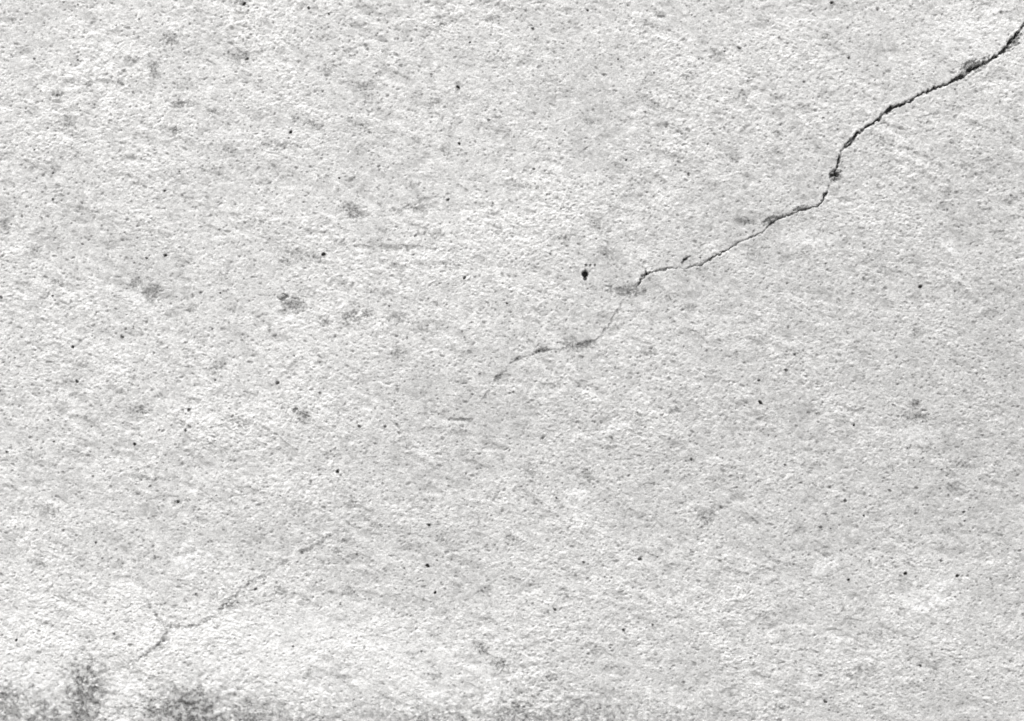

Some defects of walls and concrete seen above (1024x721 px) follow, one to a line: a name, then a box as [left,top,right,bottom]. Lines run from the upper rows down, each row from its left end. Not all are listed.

crack [736,23,1024,225]
crack [494,271,647,380]